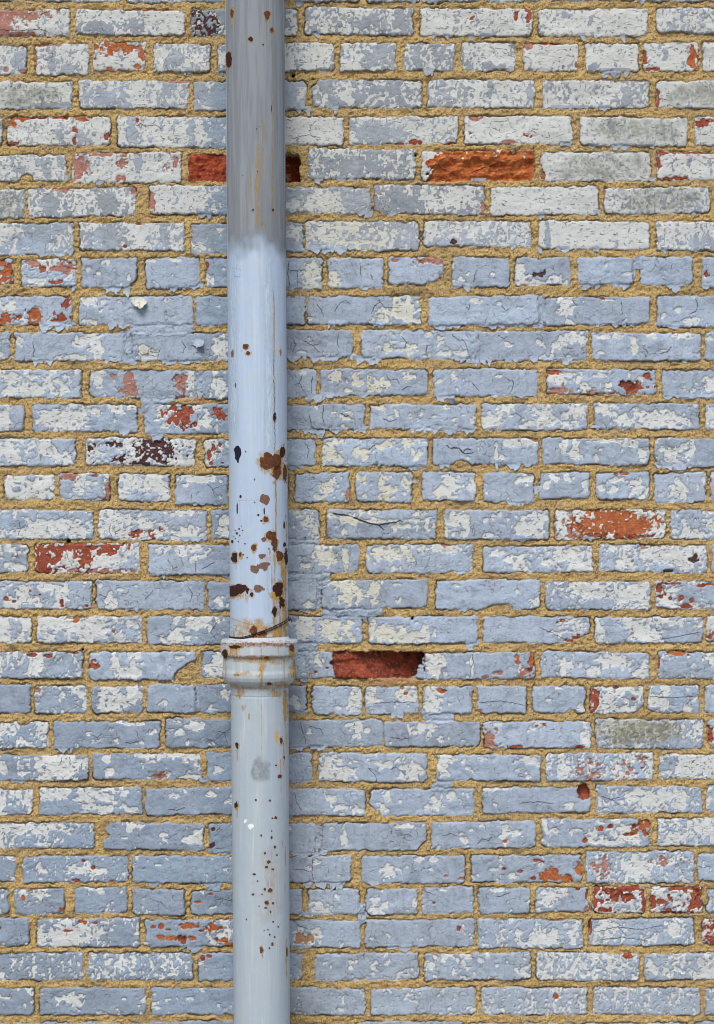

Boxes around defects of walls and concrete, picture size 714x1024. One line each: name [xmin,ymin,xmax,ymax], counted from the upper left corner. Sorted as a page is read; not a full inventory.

peeling [0,0,250,1015]
rust [222,478,296,718]
peeling [158,263,714,1024]
spalling [284,0,714,304]